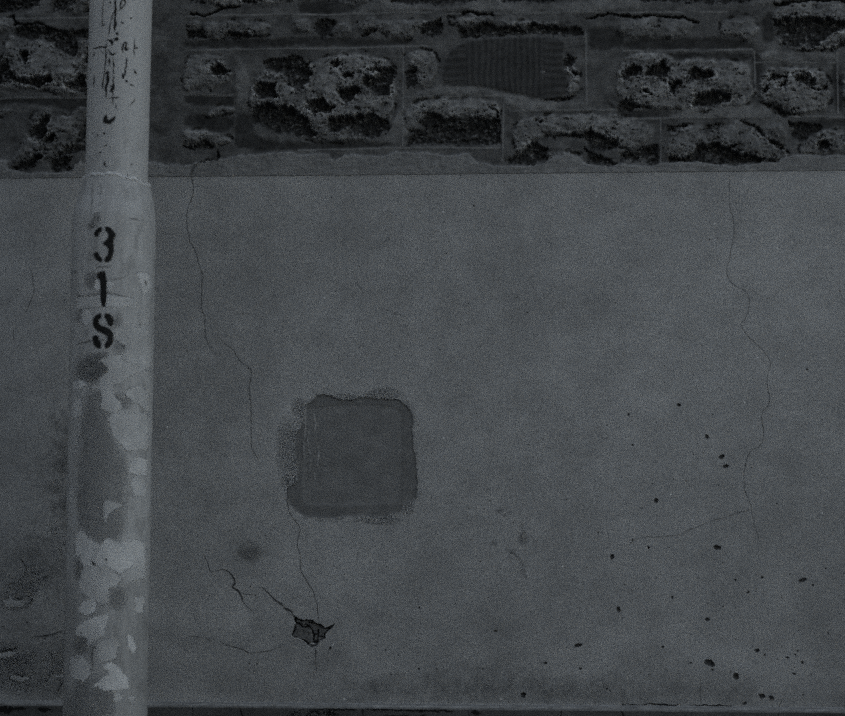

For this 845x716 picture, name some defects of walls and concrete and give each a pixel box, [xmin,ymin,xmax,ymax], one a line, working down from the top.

peeling [72,323,152,497]
crack [186,156,252,401]
crack [628,177,771,545]
peeling [50,531,146,705]
crack [204,556,294,616]
crack [287,491,319,619]
flaking render [289,612,334,650]